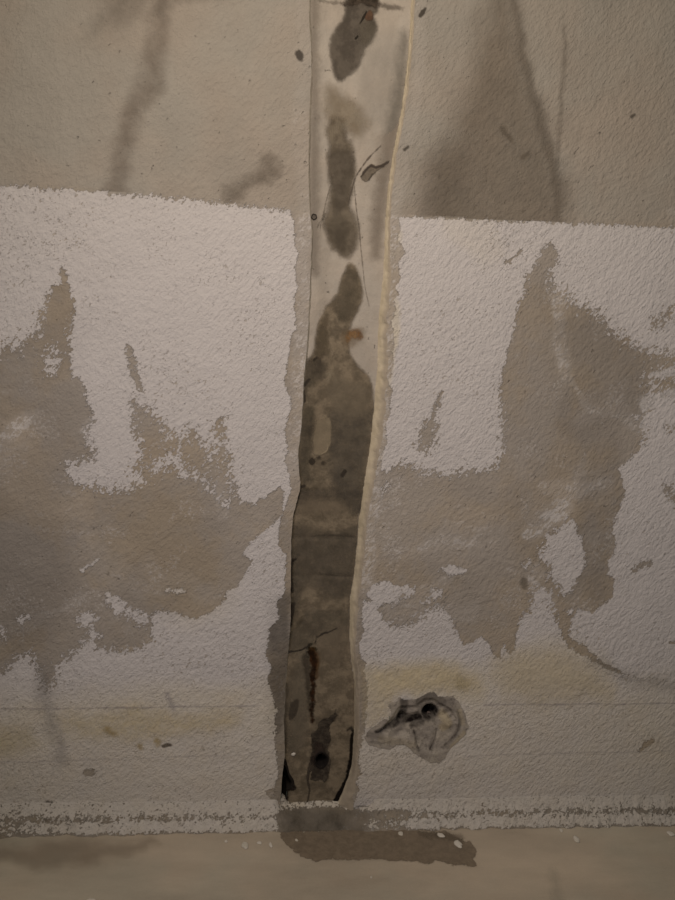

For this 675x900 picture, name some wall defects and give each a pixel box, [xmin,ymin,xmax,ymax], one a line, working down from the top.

leakage [330,0,379,80]
leakage [374,123,399,248]
peeling [0,260,286,701]
leakage [284,94,374,803]
peeling [258,0,675,810]
rust [303,649,319,723]
crack [333,727,369,807]